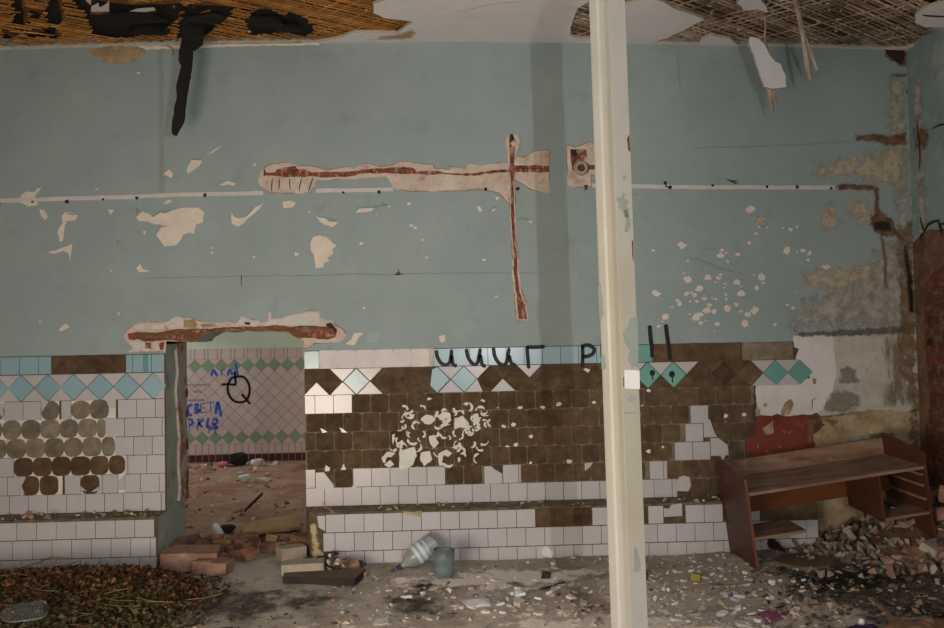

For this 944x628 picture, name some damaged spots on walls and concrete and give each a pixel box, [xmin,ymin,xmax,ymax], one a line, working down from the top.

spalling [885,50,907,77]
flaking render [566,141,595,188]
crack [916,118,944,170]
peeling [48,212,78,259]
peeling [136,200,204,247]
peeling [309,212,338,268]
peeling [656,241,766,331]
peeling [52,354,126,374]
peeling [126,316,606,487]
peeling [623,265,944,496]
peeling [0,400,125,495]
peeling [536,507,592,527]